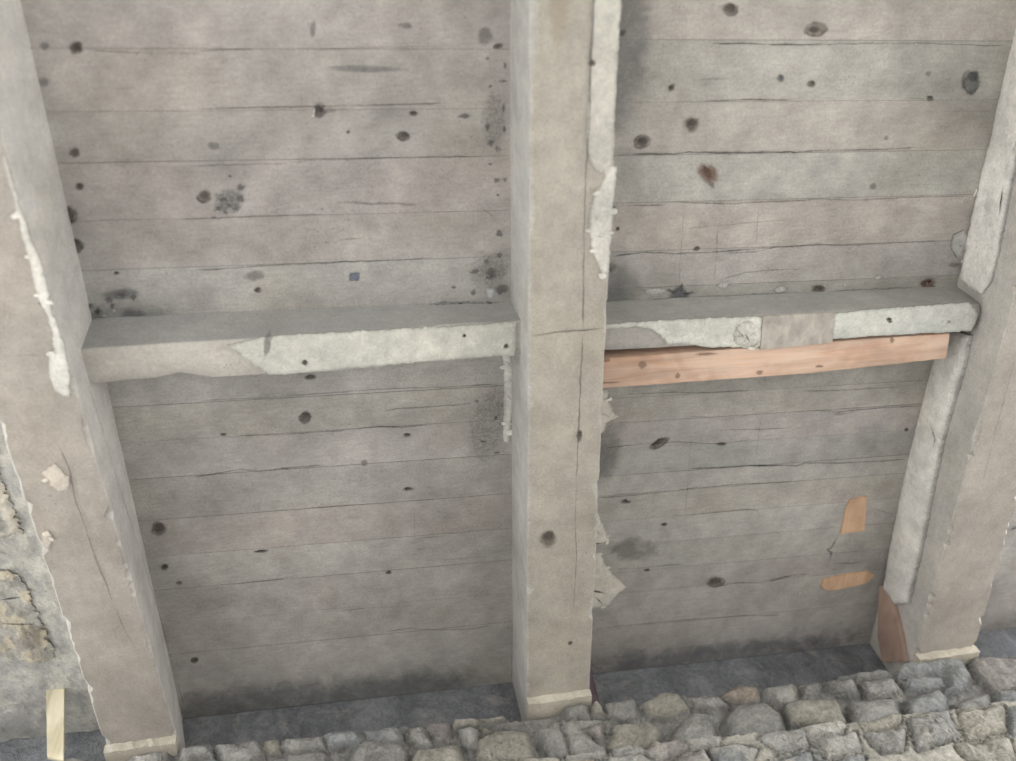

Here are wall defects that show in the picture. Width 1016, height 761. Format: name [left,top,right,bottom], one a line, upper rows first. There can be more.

leakage [636,136,650,148]
corrosion [698,165,717,182]
peeling [586,166,620,279]
peeling [3,155,70,398]
flaking render [601,389,619,435]
flaking render [0,474,24,538]
flaking render [592,513,627,609]
flaking render [0,569,55,663]